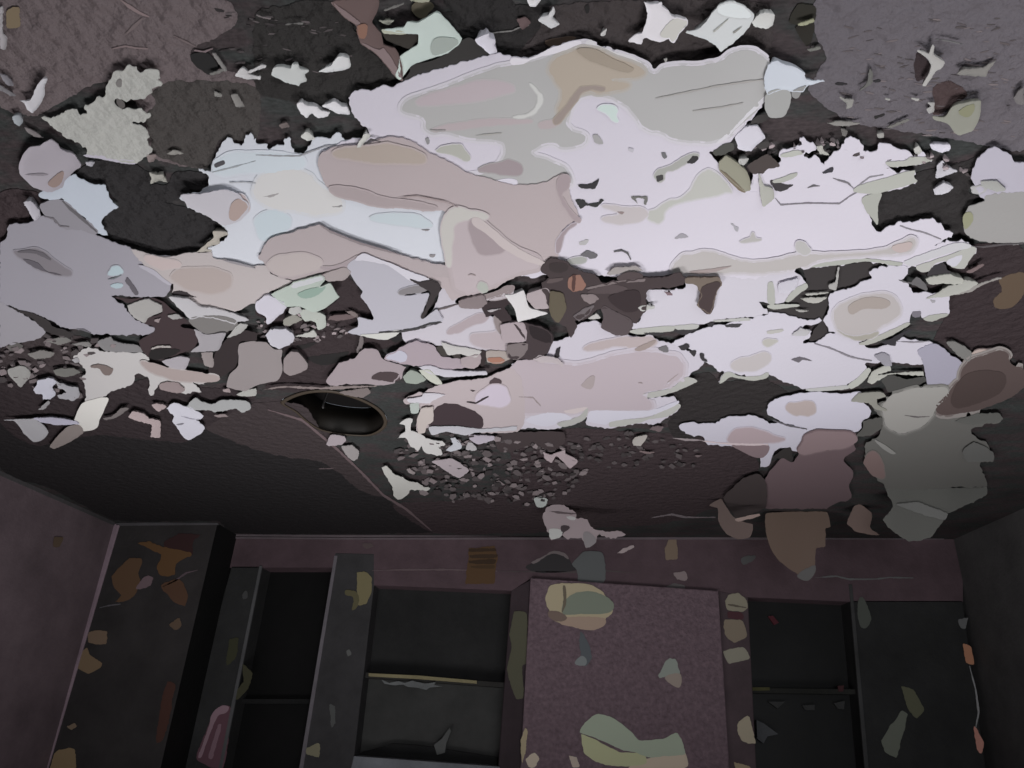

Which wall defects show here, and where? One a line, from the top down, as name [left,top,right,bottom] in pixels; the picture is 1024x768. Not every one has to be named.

spalling [0,0,1024,256]
spalling [767,262,888,342]
spalling [882,311,921,346]
spalling [899,243,1024,367]
spalling [0,239,830,666]
spalling [851,365,926,437]
peeling [963,442,994,462]
peeling [956,412,1002,425]
peeling [847,504,879,535]
peeling [897,502,948,520]